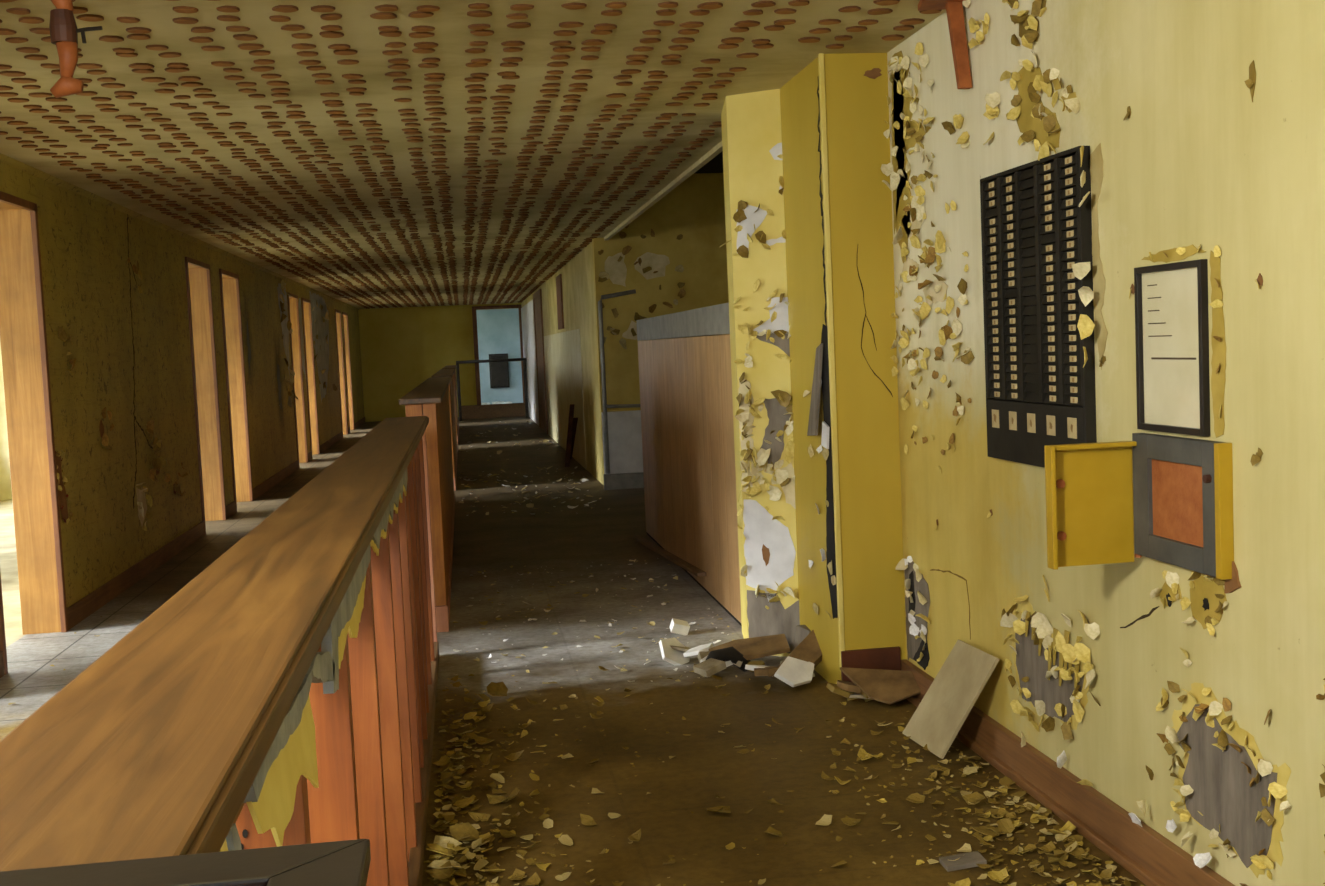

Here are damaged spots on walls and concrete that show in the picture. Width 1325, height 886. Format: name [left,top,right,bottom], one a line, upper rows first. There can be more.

peeling [598,224,686,349]
peeling [720,200,787,258]
peeling [769,143,783,160]
peeling [863,0,1080,474]
peeling [1072,143,1108,370]
spalling [428,279,838,886]
spalling [1000,575,1100,768]
peeling [1150,561,1241,636]
peeling [795,702,1146,886]
spalling [1156,681,1291,886]